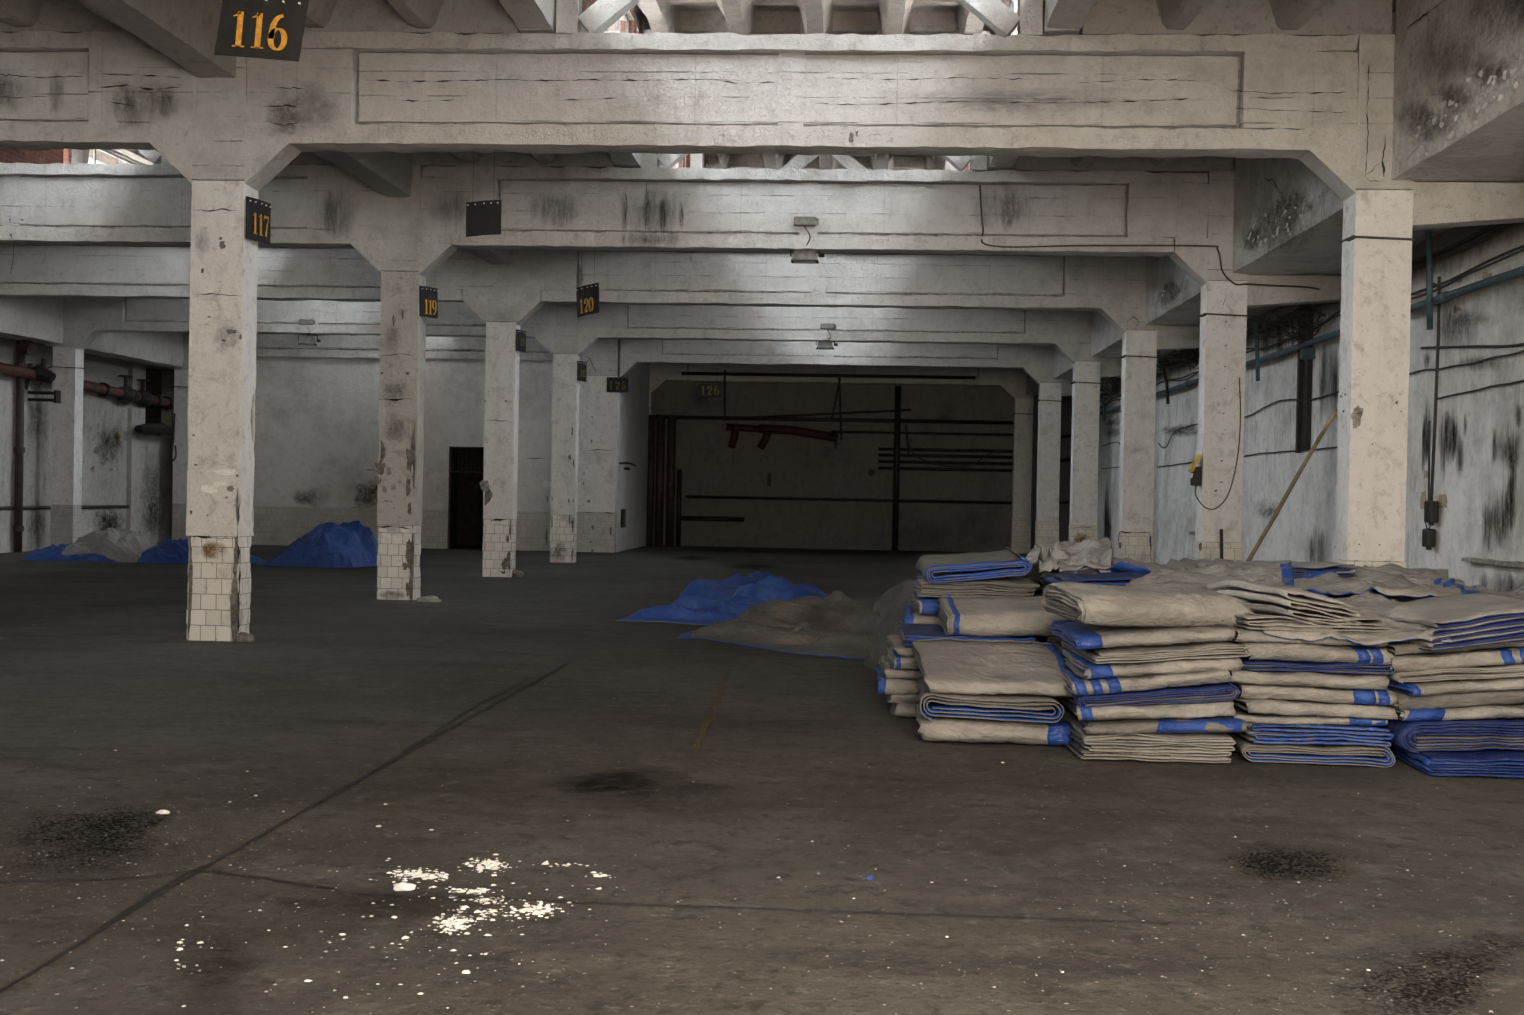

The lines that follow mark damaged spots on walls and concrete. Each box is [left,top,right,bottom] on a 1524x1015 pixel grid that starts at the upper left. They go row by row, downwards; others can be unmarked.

damp [1422,413,1466,468]
damp [1483,409,1520,544]